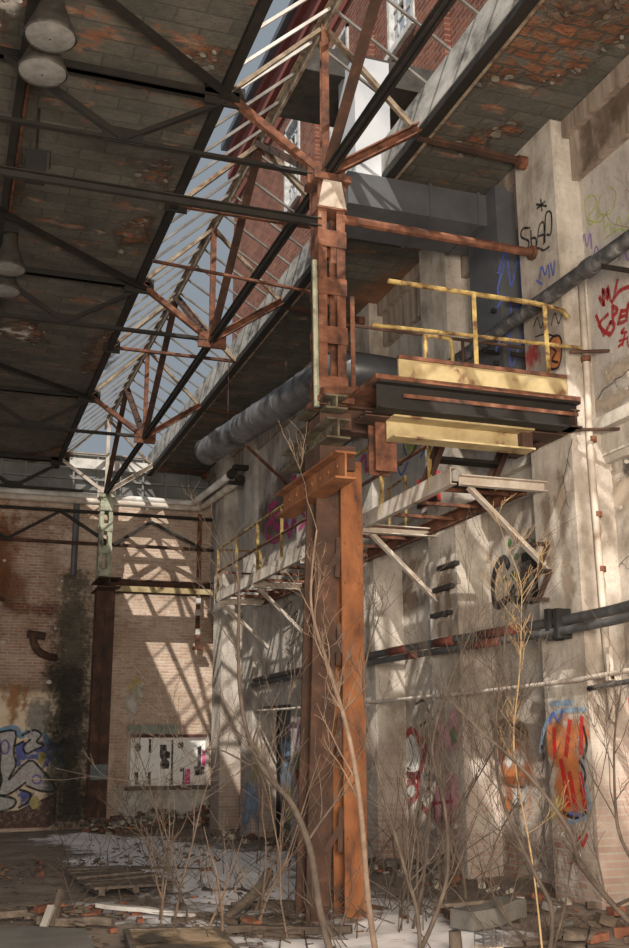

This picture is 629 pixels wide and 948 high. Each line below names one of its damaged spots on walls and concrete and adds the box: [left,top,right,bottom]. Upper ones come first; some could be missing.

peeling [0,0,23,31]
spalling [0,320,46,345]
water stain [42,571,93,829]